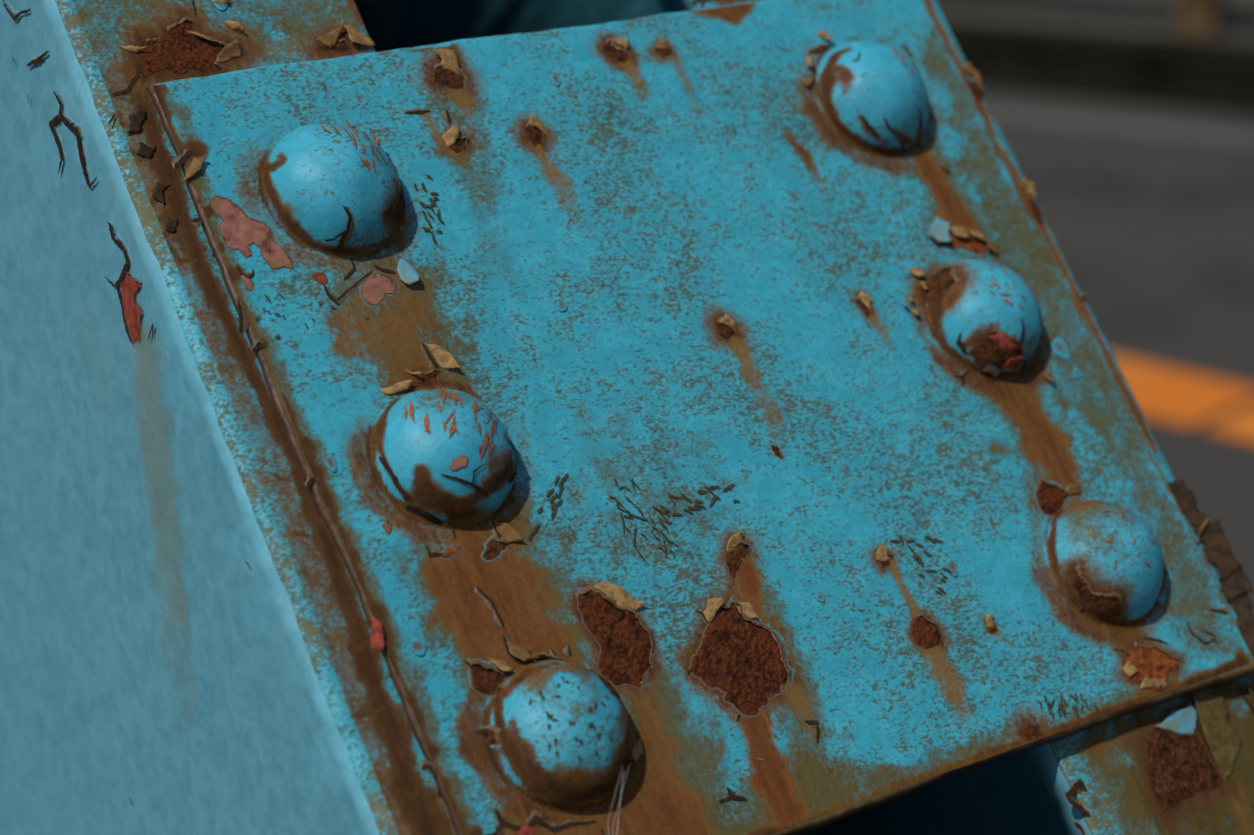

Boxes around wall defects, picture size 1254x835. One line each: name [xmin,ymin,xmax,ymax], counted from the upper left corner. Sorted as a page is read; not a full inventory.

peeling [104,222,154,343]
rust [797,47,984,242]
rust [924,0,1157,452]
rust [101,63,483,835]
rust [240,146,718,835]
peeling [570,580,661,700]
peeling [679,530,817,828]
rust [910,271,1166,650]
rust [863,652,1250,800]
peeling [1113,634,1186,697]
peeling [1130,689,1242,833]
peeling [1166,479,1254,657]